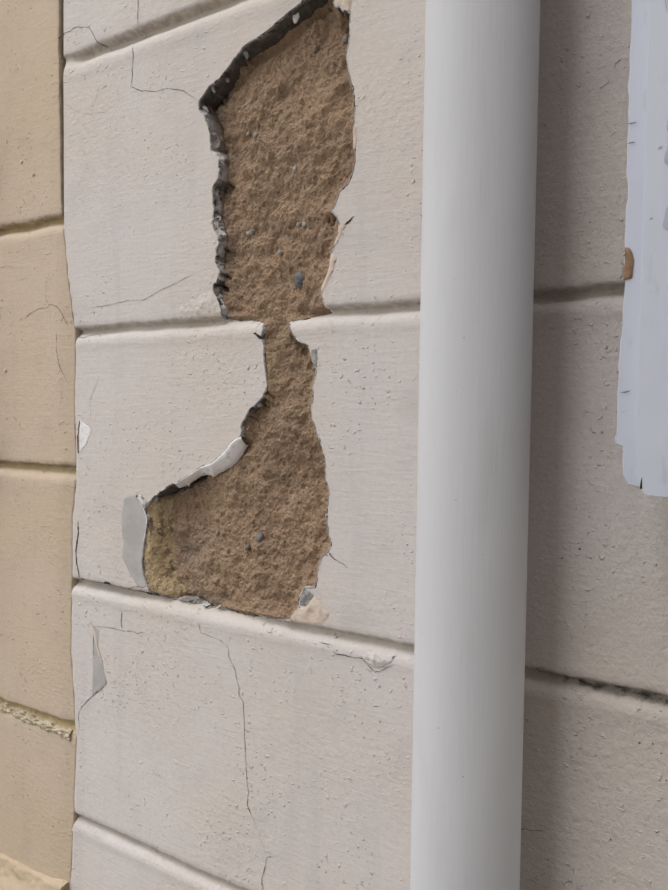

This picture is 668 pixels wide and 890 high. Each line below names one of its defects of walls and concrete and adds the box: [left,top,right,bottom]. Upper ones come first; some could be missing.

crack [131,11,191,96]
spalling [122,0,356,624]